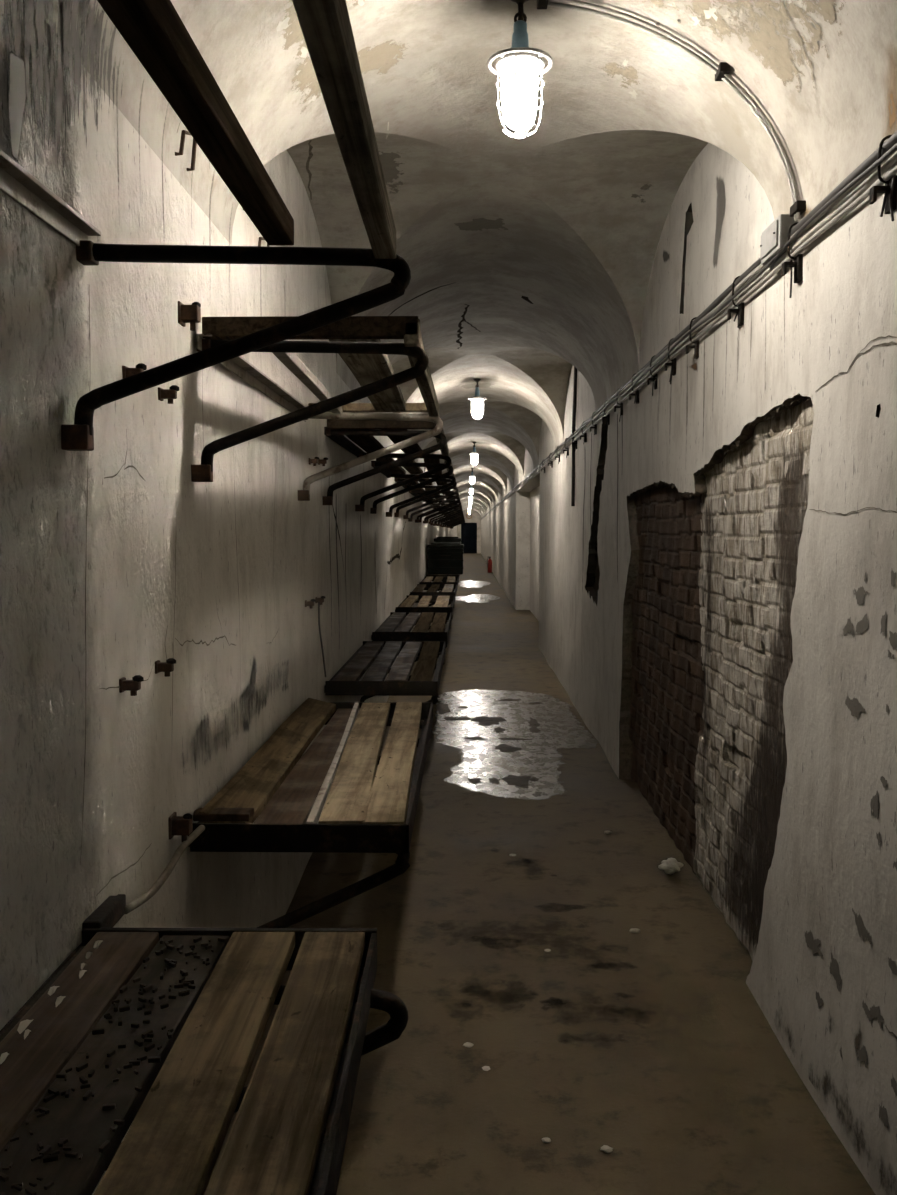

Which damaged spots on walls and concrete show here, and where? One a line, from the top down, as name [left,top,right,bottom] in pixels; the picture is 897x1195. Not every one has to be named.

peeling [276,0,322,114]
peeling [357,40,408,75]
peeling [601,59,640,99]
peeling [642,0,848,93]
crack [815,335,897,392]
peeling [843,573,897,659]
flaking render [619,394,814,961]
peeling [845,696,866,719]
peeling [870,776,887,845]
peeling [852,909,872,945]
peeling [805,930,842,991]
peeling [862,1000,884,1029]